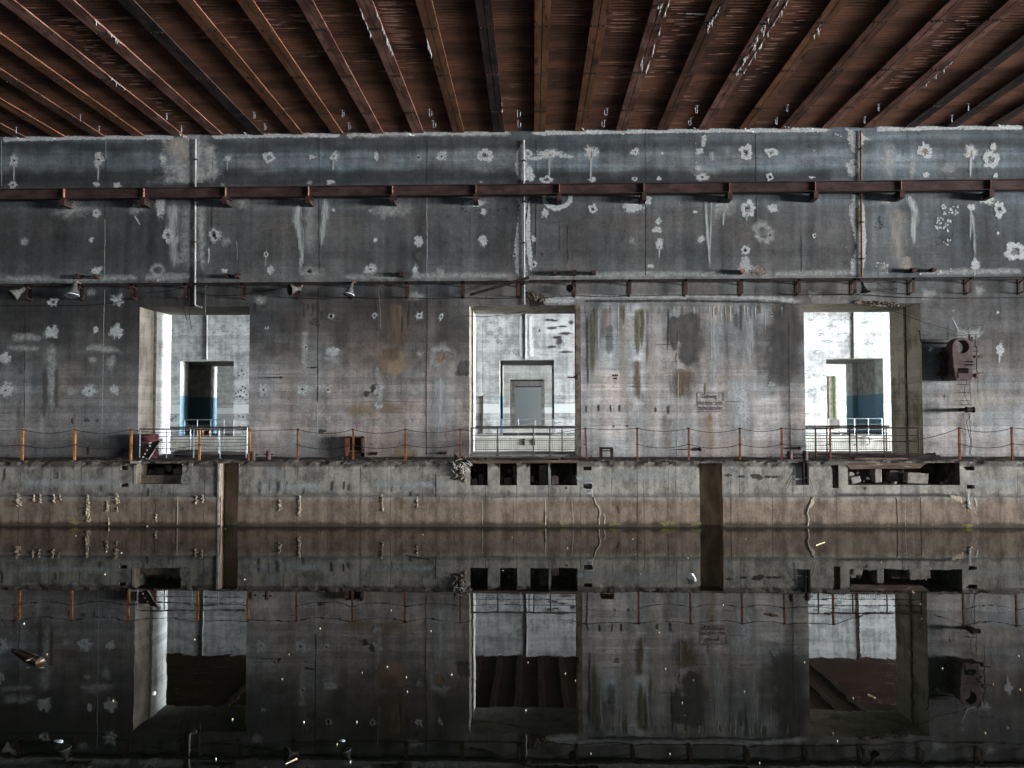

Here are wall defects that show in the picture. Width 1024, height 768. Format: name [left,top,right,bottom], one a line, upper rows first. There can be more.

damp [293,203,321,276]
damp [902,196,1024,275]
damp [544,294,799,436]
crack [572,489,606,525]
crack [805,497,814,526]